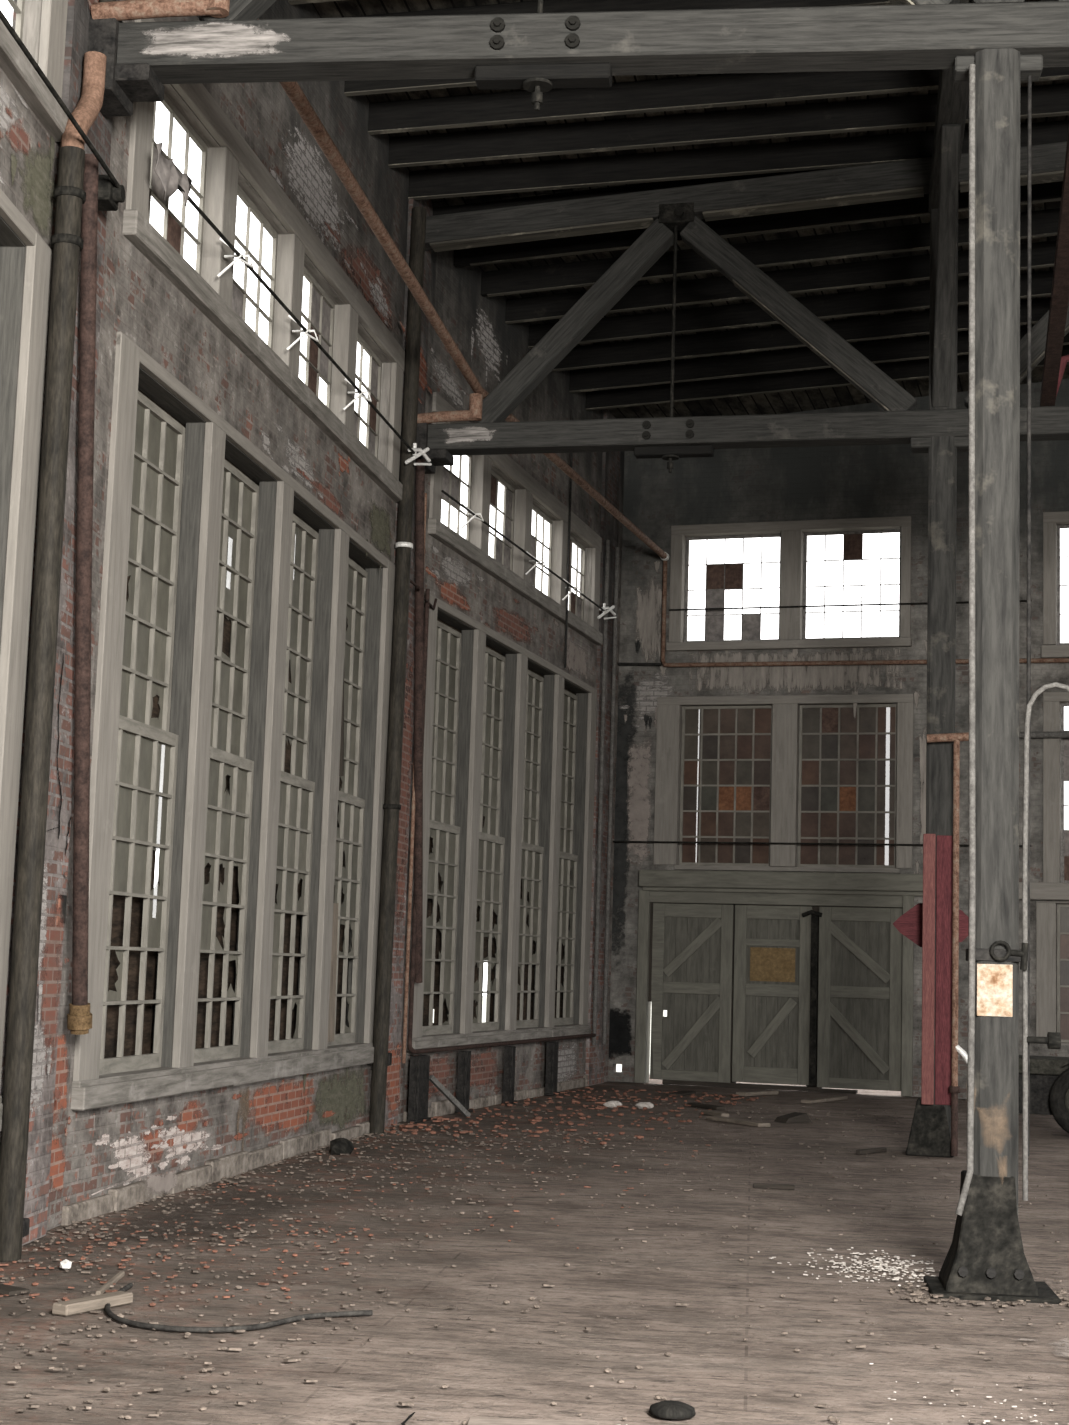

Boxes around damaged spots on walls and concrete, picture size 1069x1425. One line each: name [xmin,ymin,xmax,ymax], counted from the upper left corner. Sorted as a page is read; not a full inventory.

flaking render [95,1074,335,1186]